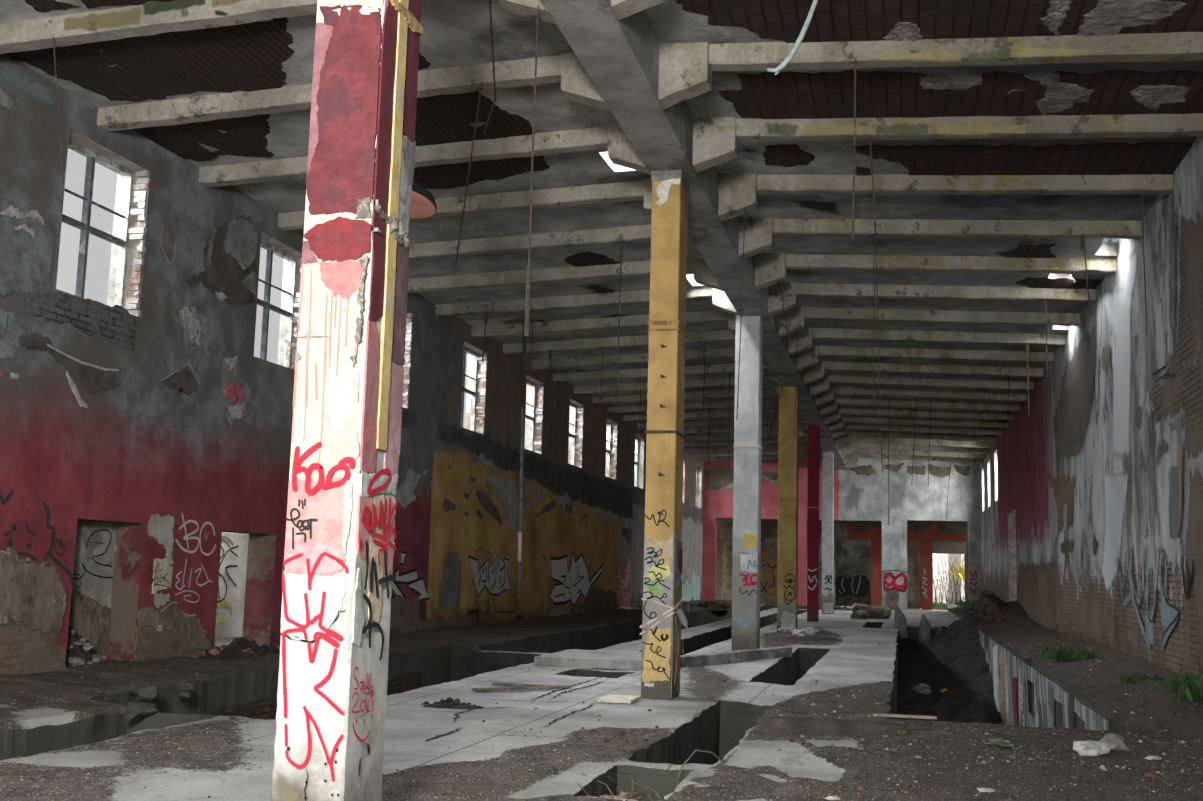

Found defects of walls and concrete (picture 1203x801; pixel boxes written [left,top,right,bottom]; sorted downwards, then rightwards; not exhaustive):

peeling [25,0,80,12]
peeling [332,6,381,16]
peeling [1040,0,1072,37]
peeling [1077,0,1186,37]
peeling [920,72,983,91]
peeling [1007,71,1094,115]
peeling [762,144,815,167]
flaking render [0,205,136,350]
spalling [350,255,370,368]
flaking render [1053,327,1111,466]
flaking render [1134,208,1203,674]